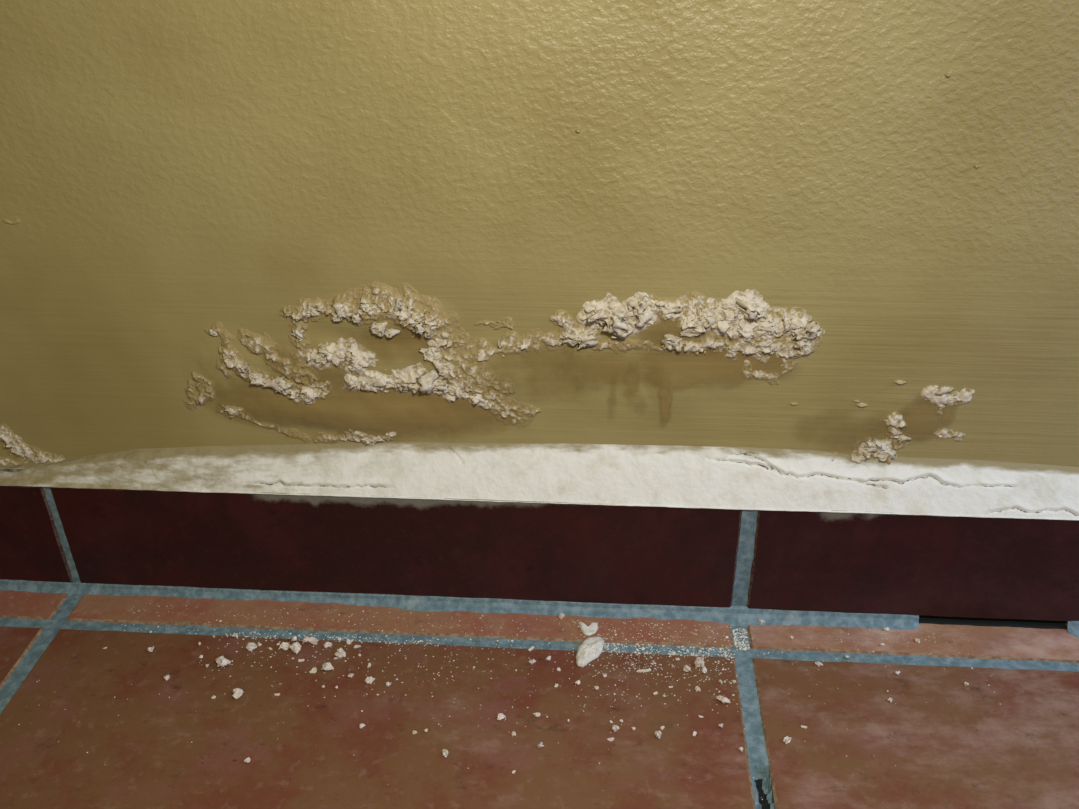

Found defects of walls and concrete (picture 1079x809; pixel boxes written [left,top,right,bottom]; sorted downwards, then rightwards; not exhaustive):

flaking render [180,281,826,446]
flaking render [0,423,65,472]
crack [709,451,1079,516]
flaking render [851,382,975,464]